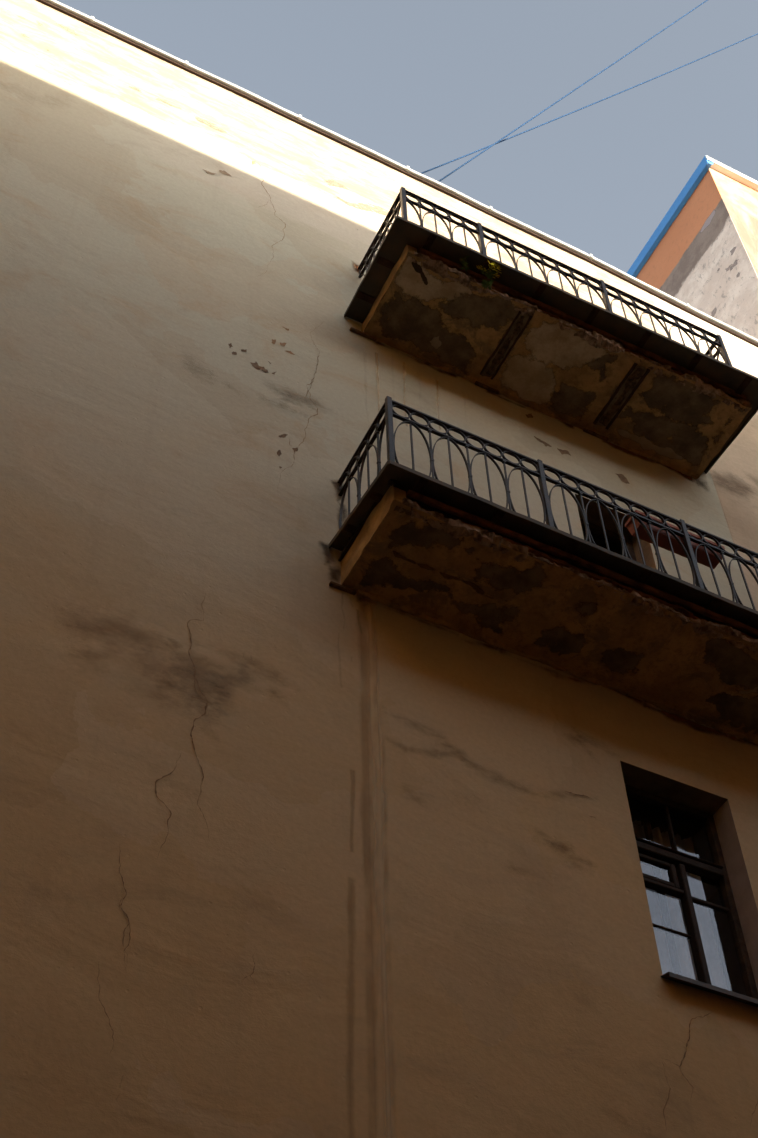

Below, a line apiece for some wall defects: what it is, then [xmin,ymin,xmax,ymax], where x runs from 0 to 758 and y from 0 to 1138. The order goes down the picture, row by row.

peeling [378,251,752,466]
spalling [388,498,758,654]
crack [155,598,210,852]